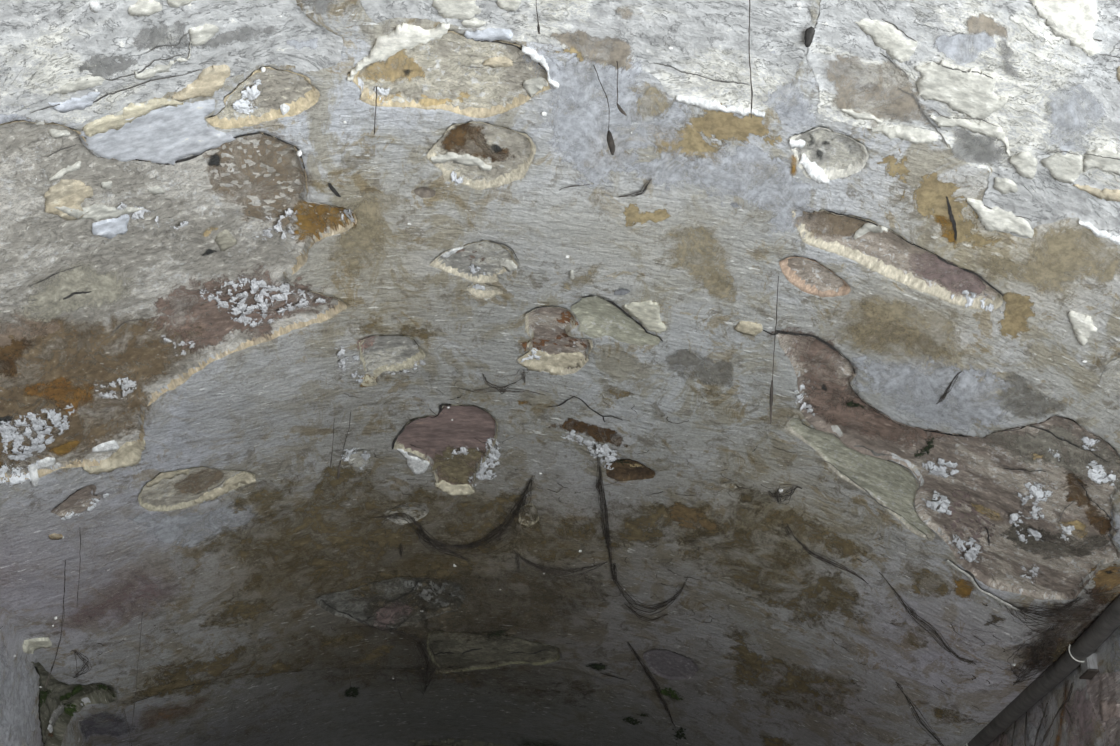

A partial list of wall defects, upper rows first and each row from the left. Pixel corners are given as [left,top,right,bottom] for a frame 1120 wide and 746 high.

peeling [347,0,1120,246]
flaking render [0,0,358,520]
flaking render [429,240,519,299]
flaking render [779,207,1004,313]
flaking render [351,335,426,387]
flaking render [518,288,667,375]
peeling [1068,311,1098,346]
flaking render [392,404,501,496]
flaking render [606,459,655,482]
flaking render [734,321,1120,600]
damp [131,466,867,727]
flaking render [23,637,117,746]